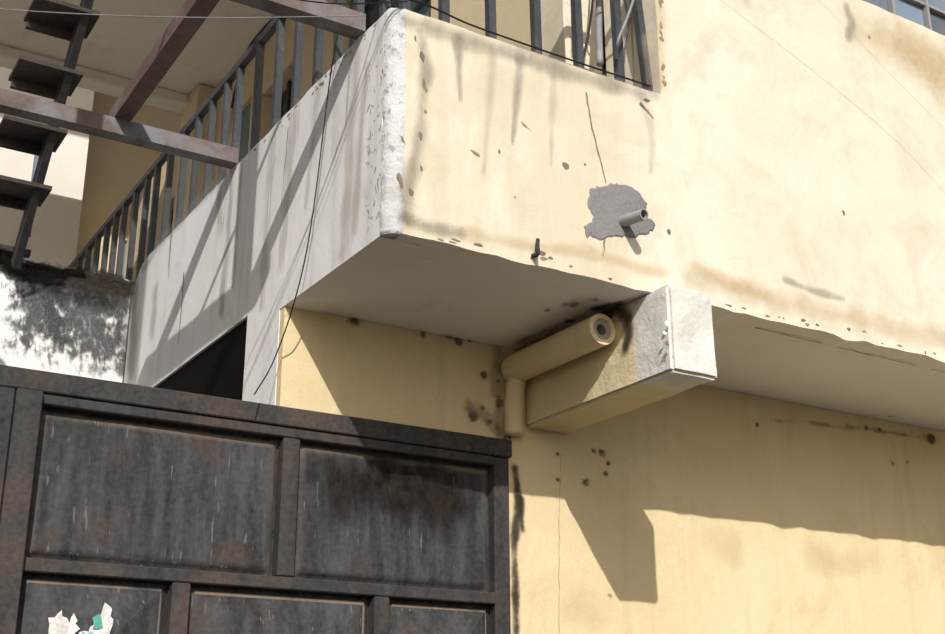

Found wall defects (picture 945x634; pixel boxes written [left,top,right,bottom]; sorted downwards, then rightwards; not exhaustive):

damp [593,299,633,351]